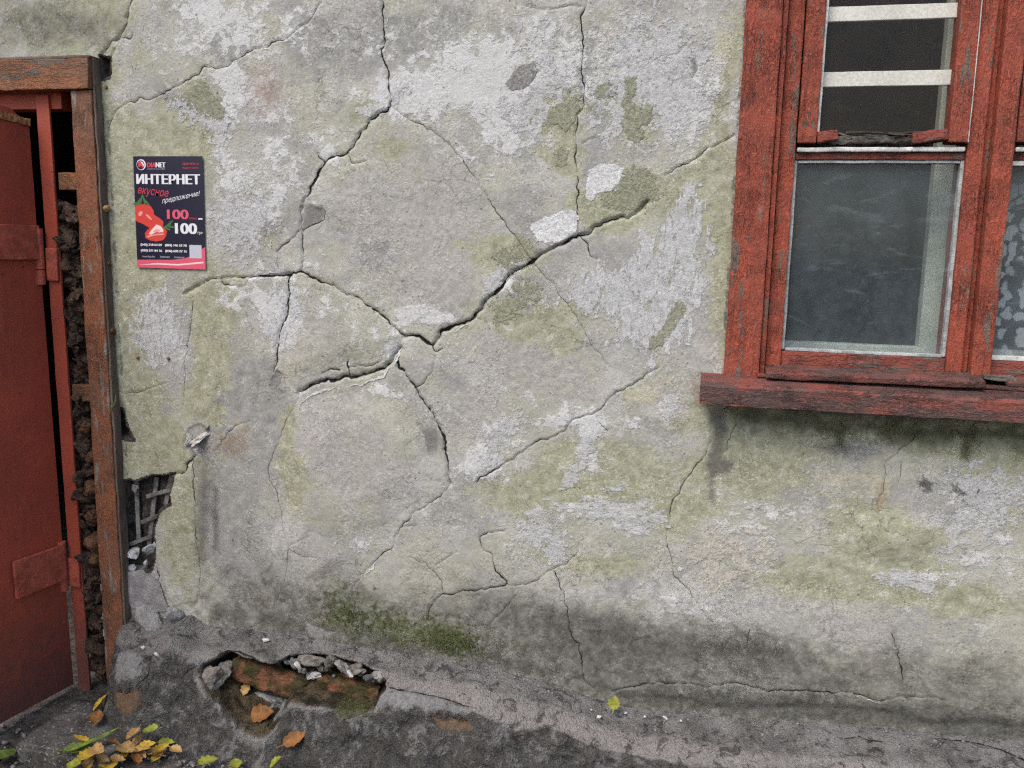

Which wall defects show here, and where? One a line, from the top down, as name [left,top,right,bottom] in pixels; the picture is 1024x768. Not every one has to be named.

crack [99,0,133,72]
crack [110,1,655,680]
flaking render [184,425,211,453]
damp [708,412,730,472]
damp [774,415,1024,458]
flaking render [123,472,176,613]
crack [618,413,946,704]
crack [390,687,475,708]